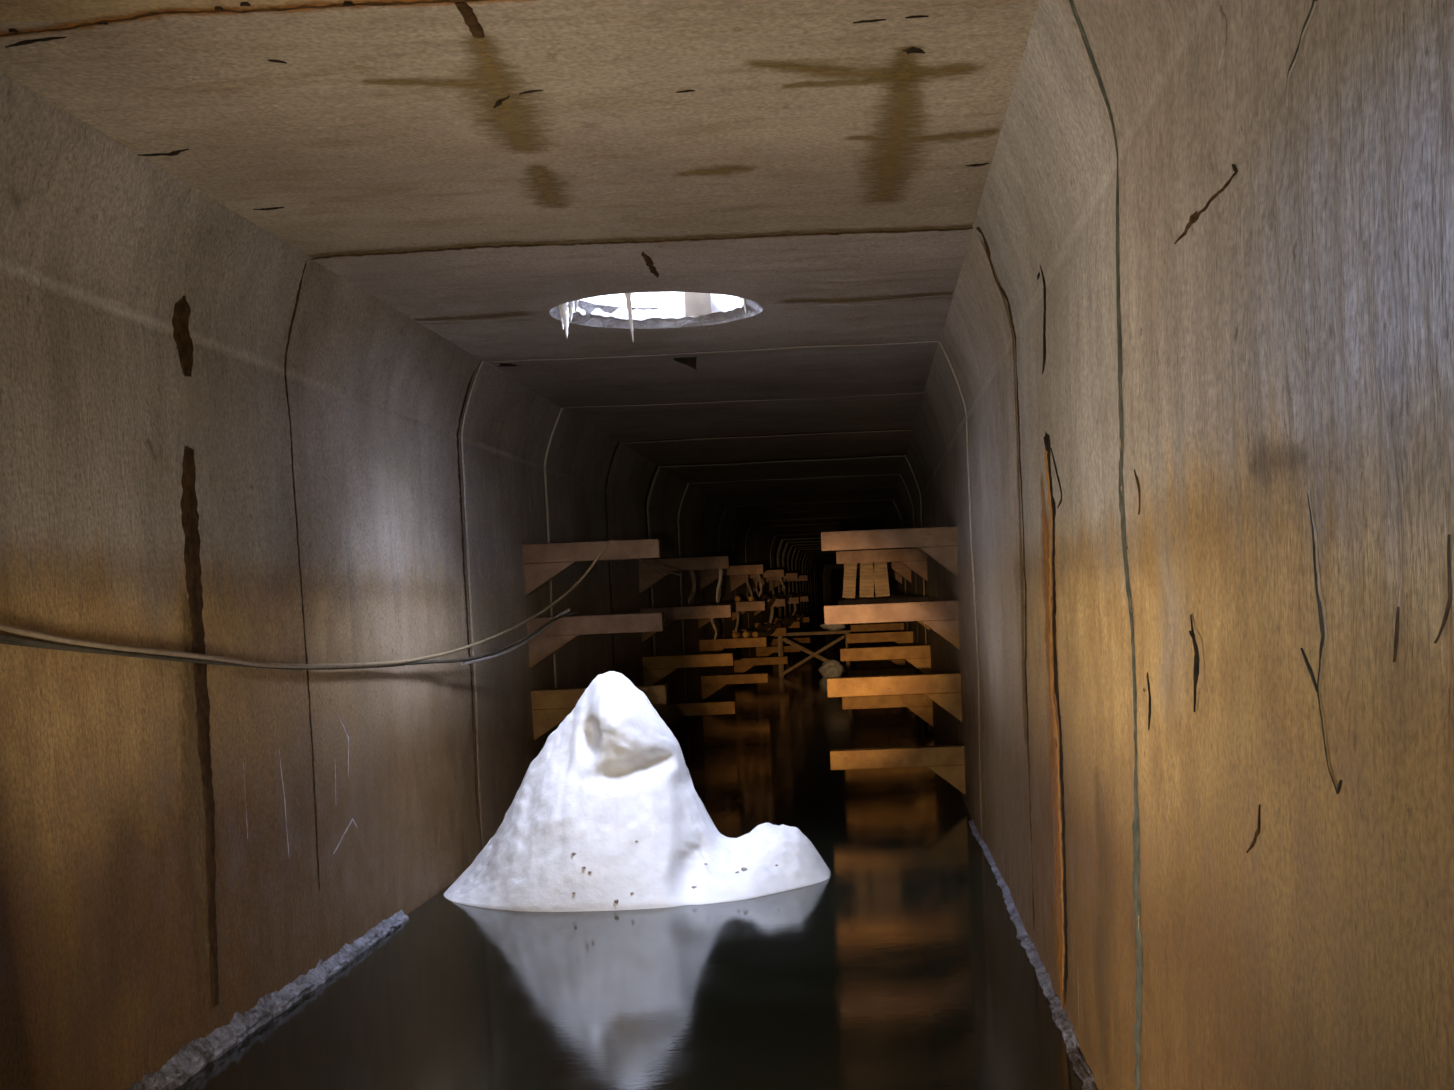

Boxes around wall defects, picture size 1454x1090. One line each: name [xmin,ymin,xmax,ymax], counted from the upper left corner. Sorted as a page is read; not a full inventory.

rust [0,0,505,37]
rust [364,37,564,208]
rust [309,225,972,259]
rust [752,47,996,202]
crack [1174,164,1238,244]
crack [1286,0,1318,107]
crack [172,295,193,377]
rust [982,243,1026,737]
crack [1068,0,1151,1090]
crack [180,446,219,1009]
rust [1041,479,1063,1008]
crack [1300,490,1342,794]